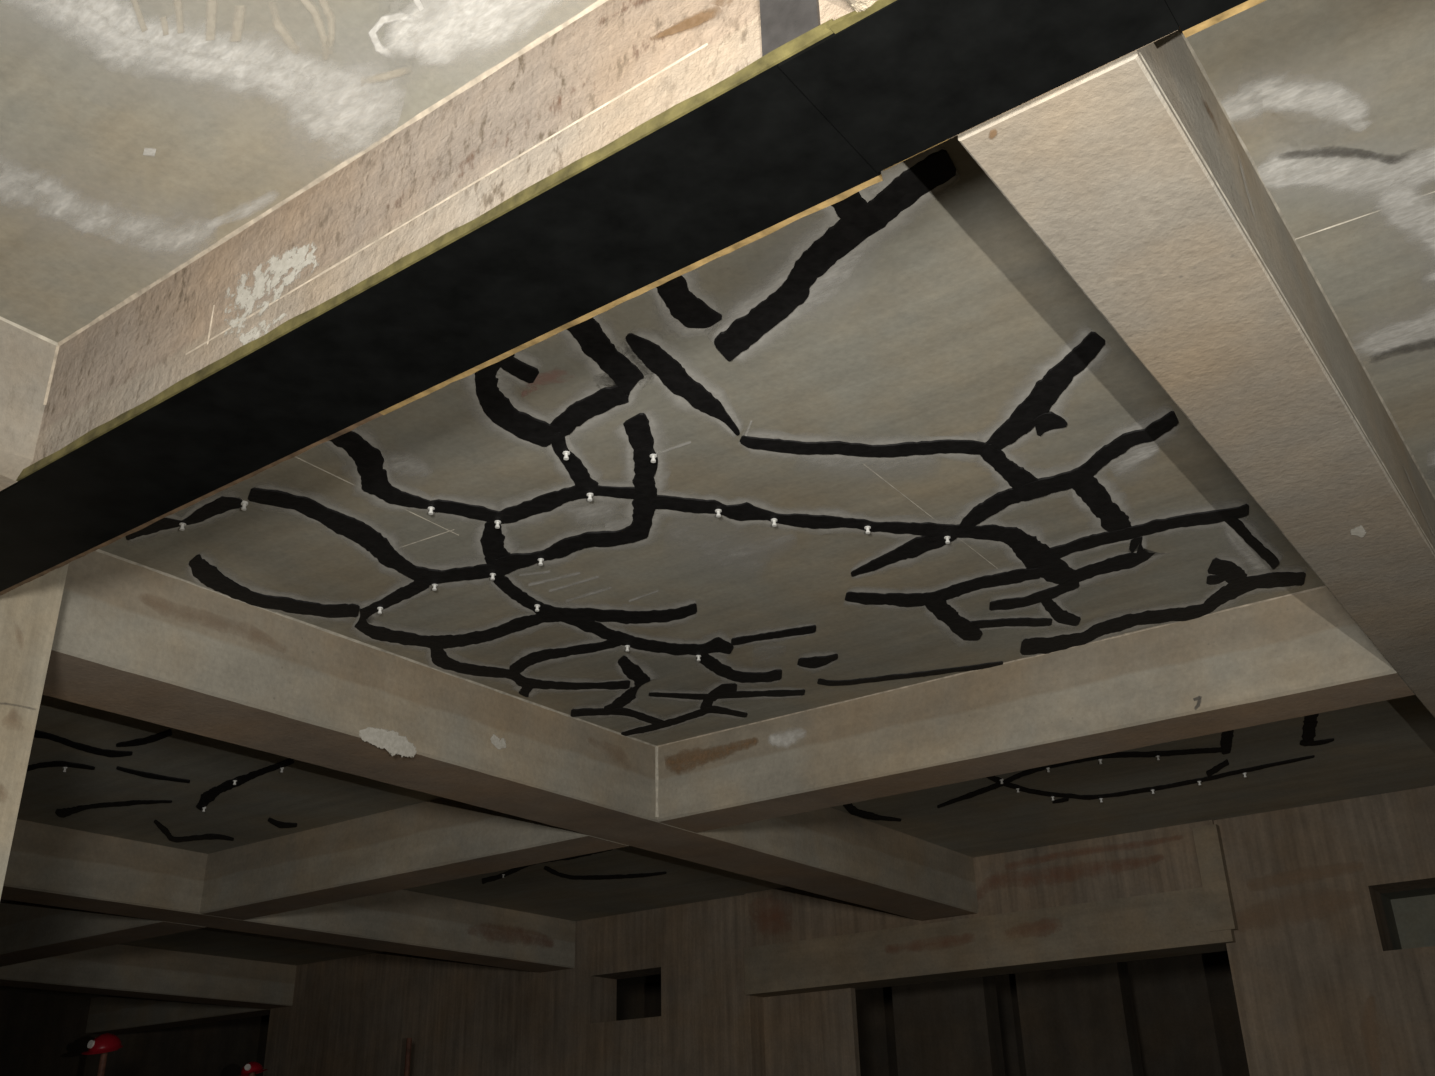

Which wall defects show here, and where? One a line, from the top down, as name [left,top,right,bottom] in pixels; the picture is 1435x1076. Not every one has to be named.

spalling [851,0,877,12]
damp [18,0,553,150]
damp [1221,77,1367,130]
damp [0,164,273,251]
damp [1258,147,1435,255]
damp [1354,309,1435,359]
crack [126,147,1306,737]
damp [1115,445,1159,474]
crack [26,729,297,843]
peeling [359,727,417,757]
crack [843,803,901,822]
crack [937,713,1334,808]